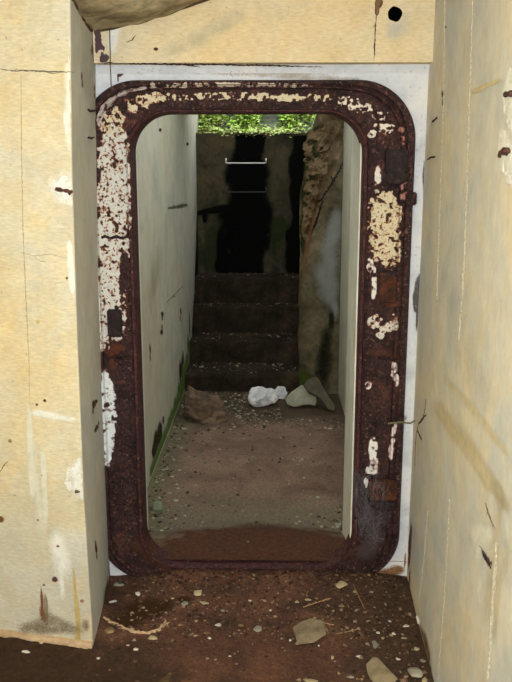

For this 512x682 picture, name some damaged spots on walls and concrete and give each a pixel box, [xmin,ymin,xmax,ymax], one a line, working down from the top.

crack [2,67,73,75]
peeling [96,82,407,352]
peeling [101,369,118,467]